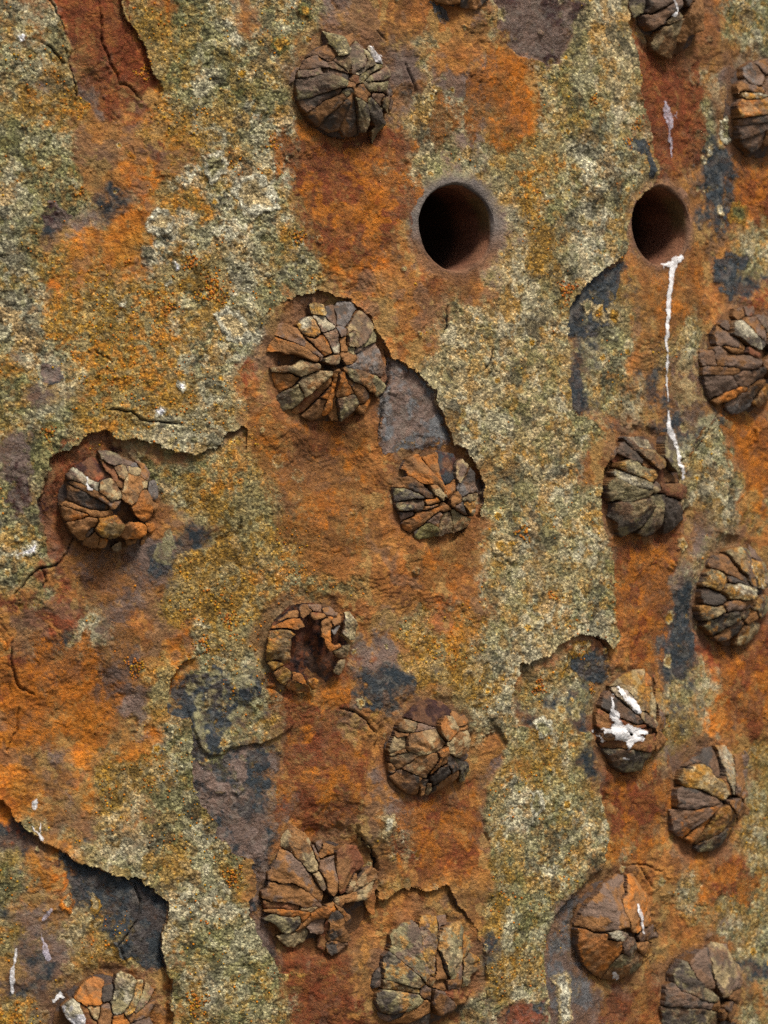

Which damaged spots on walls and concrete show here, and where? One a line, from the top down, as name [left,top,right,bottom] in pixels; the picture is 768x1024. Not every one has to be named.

corrosion [271,31,533,275]
spalling [567,259,624,339]
corrosion [266,301,386,432]
spalling [377,358,451,455]
spalling [568,370,586,415]
water stain [669,351,710,430]
corrosion [391,452,478,540]
spalling [571,651,609,684]
corrosion [571,432,768,980]
corrosion [259,604,482,1024]
spalling [59,852,168,969]
corrosion [658,941,743,1024]